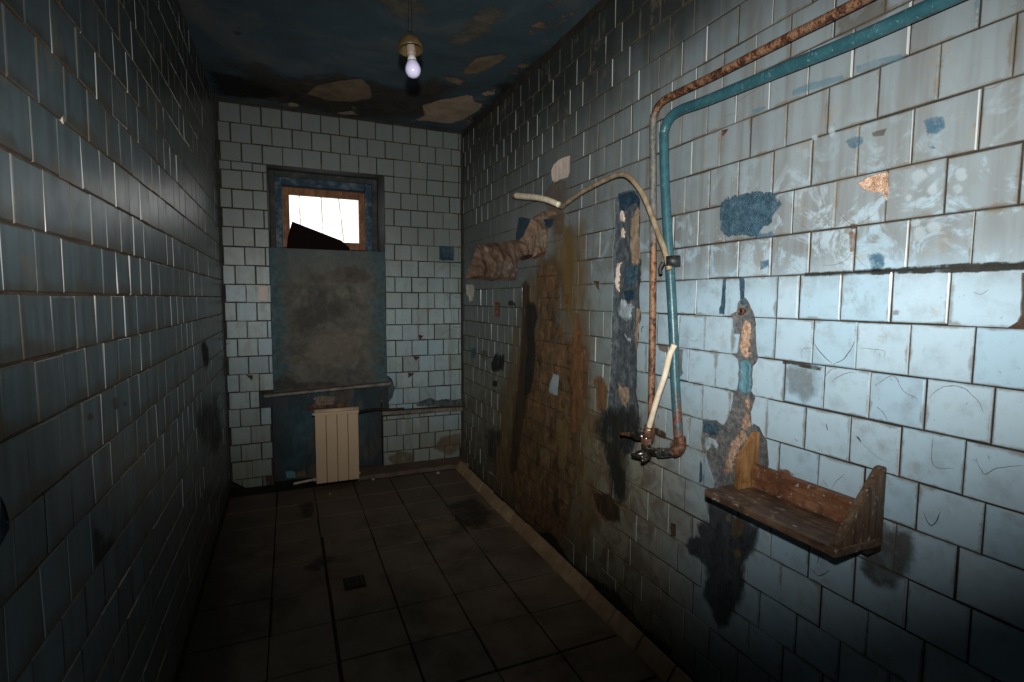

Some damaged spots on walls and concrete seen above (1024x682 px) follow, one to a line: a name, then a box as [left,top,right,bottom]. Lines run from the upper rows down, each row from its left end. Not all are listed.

peeling [307,78,372,115]
peeling [412,54,531,123]
peeling [551,156,570,183]
spalling [858,173,889,200]
spalling [466,207,566,301]
spalling [603,190,641,454]
corrosion [658,345,683,376]
spalling [699,298,769,487]
water stain [687,503,758,626]